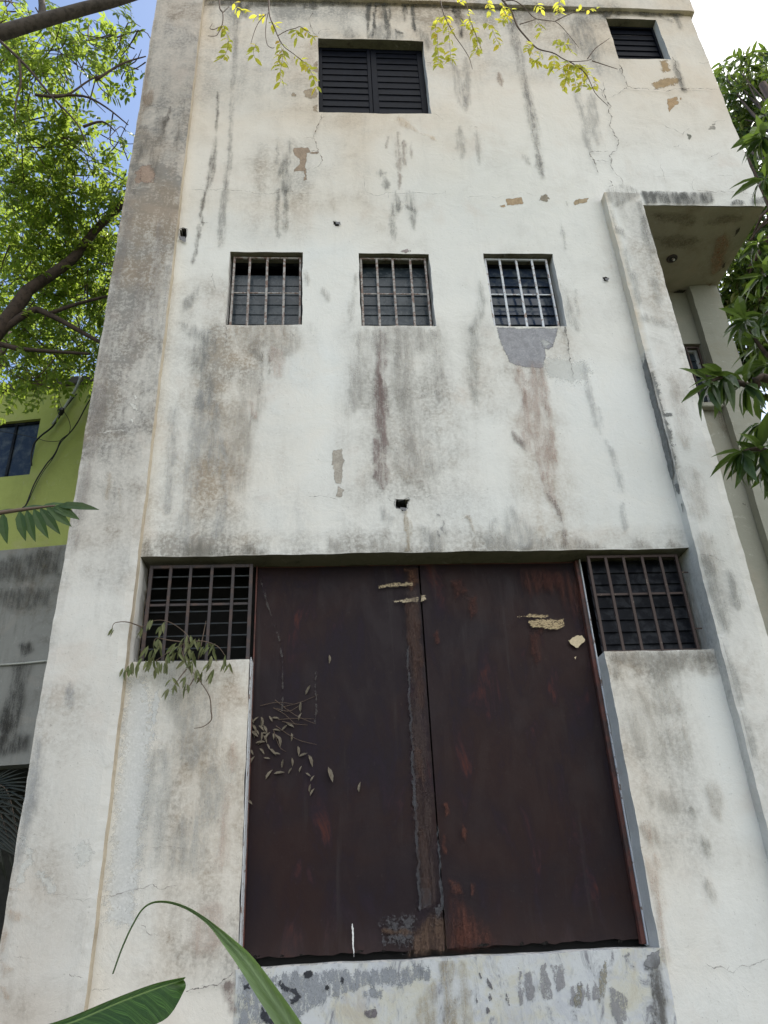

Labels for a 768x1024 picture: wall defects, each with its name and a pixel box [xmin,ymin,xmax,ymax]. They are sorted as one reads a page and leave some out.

peeling [652,60,681,112]
crack [589,57,717,187]
peeling [293,147,318,180]
peeling [501,197,523,207]
flaking render [497,327,558,368]
leakage [373,335,388,489]
peeling [332,449,345,497]
leakage [0,643,30,754]
corrosion [384,909,489,954]
leakage [651,966,667,1024]